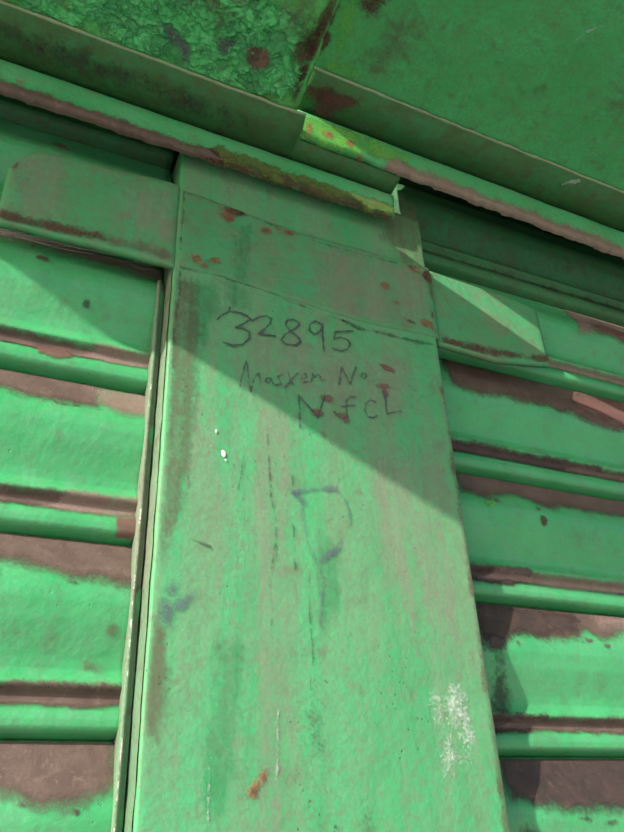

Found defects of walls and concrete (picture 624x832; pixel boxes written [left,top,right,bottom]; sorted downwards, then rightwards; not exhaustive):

corrosion [247,46,269,69]
corrosion [293,0,358,119]
corrosion [0,79,394,222]
corrosion [0,209,102,239]
corrosion [442,338,520,357]
peeling [0,369,152,417]
peeling [442,359,624,432]
peeling [0,484,142,588]
peeling [476,603,624,651]
peeling [0,739,123,815]
corrosion [248,771,266,798]
peeling [499,759,624,824]